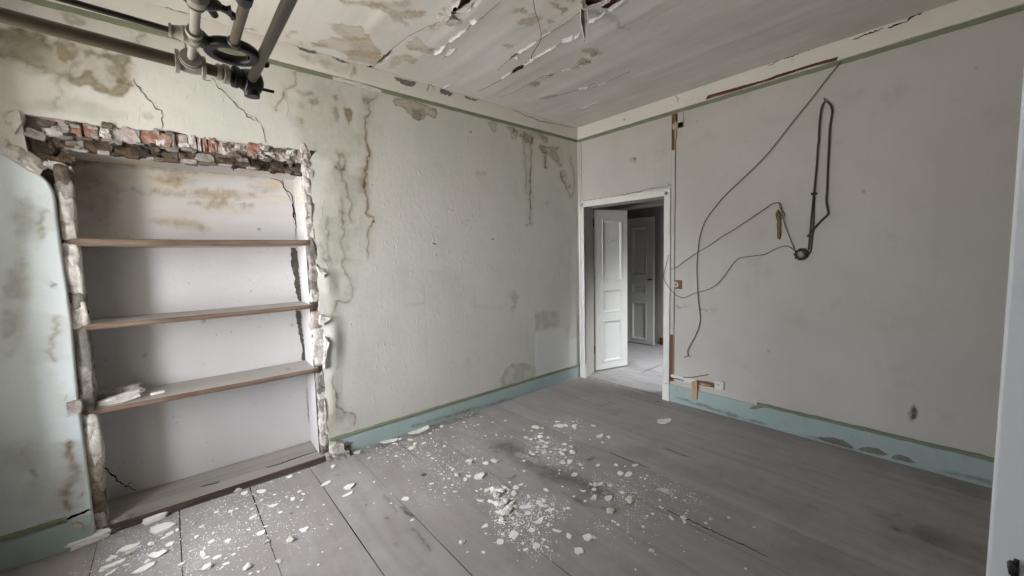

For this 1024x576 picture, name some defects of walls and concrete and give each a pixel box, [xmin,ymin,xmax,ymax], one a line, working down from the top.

leakage [78,71,131,96]
crack [134,80,163,127]
crack [203,78,266,142]
crack [366,3,499,69]
crack [479,0,630,128]
flaking render [0,110,512,530]
peeling [819,437,916,463]